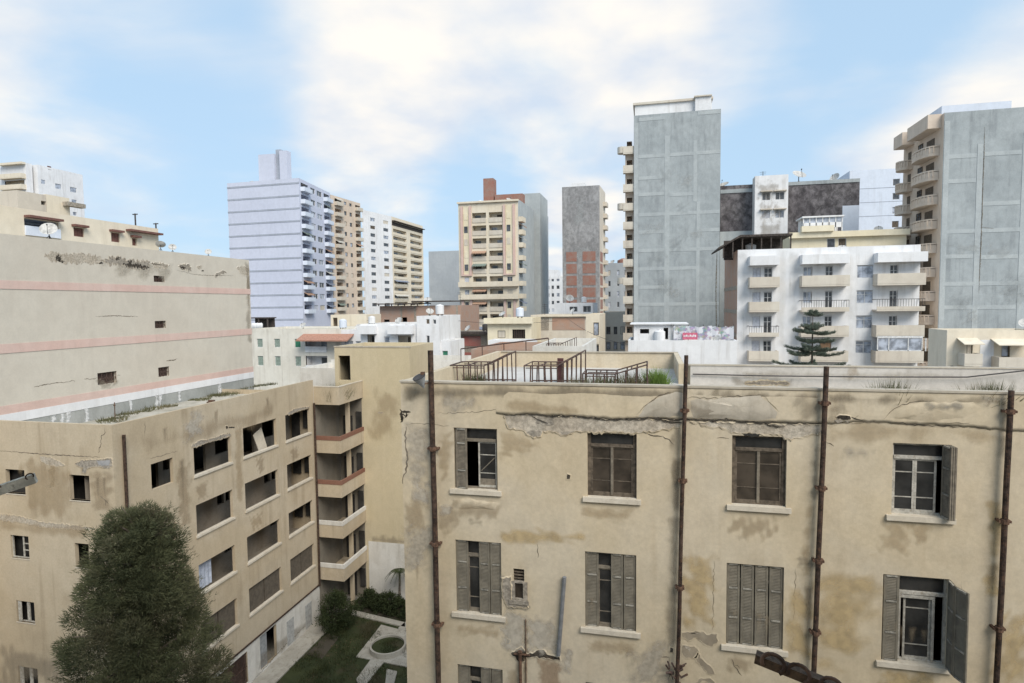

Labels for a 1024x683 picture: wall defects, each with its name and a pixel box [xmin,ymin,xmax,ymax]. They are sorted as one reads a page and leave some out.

spalling [44,251,249,278]
flaking render [496,379,1024,442]
spalling [39,455,114,474]
crack [402,392,988,484]
flaking render [680,630,719,683]